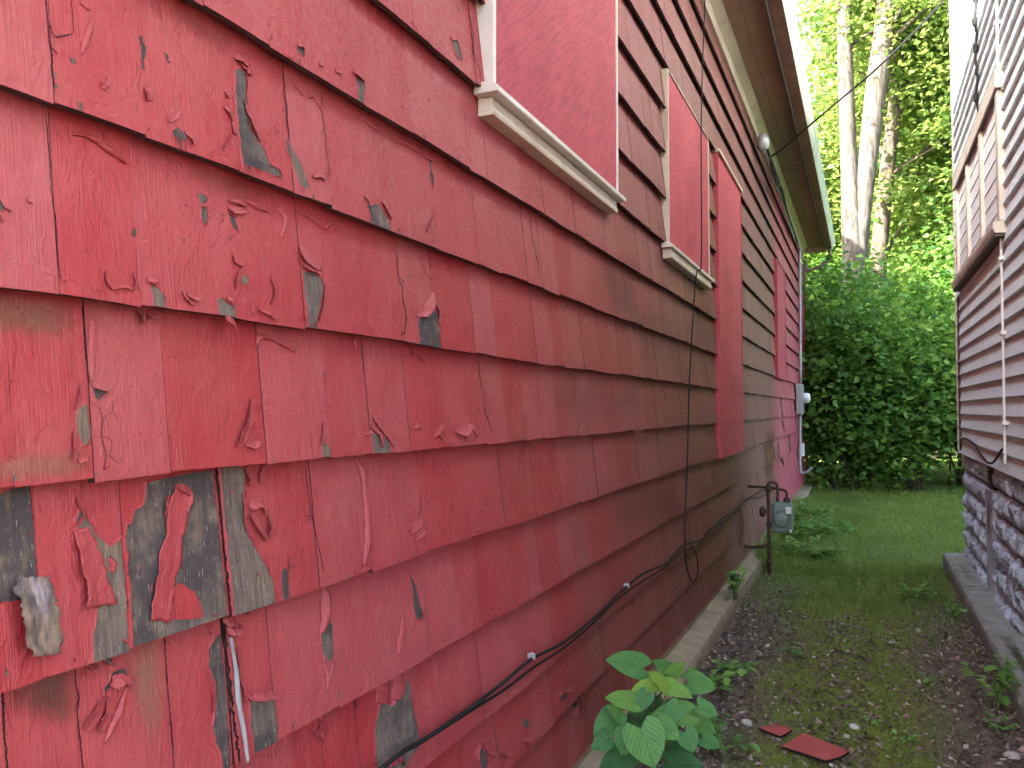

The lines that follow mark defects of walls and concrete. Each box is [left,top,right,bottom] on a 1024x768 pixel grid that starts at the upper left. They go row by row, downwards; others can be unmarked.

peeling [223,54,327,196]
peeling [364,194,393,230]
peeling [131,228,166,307]
peeling [215,253,250,331]
peeling [299,245,326,328]
peeling [411,292,442,361]
peeling [72,318,110,464]
crack [98,407,117,470]
peeling [0,485,64,657]
peeling [73,464,293,768]
peeling [319,586,335,692]
peeling [373,668,420,768]